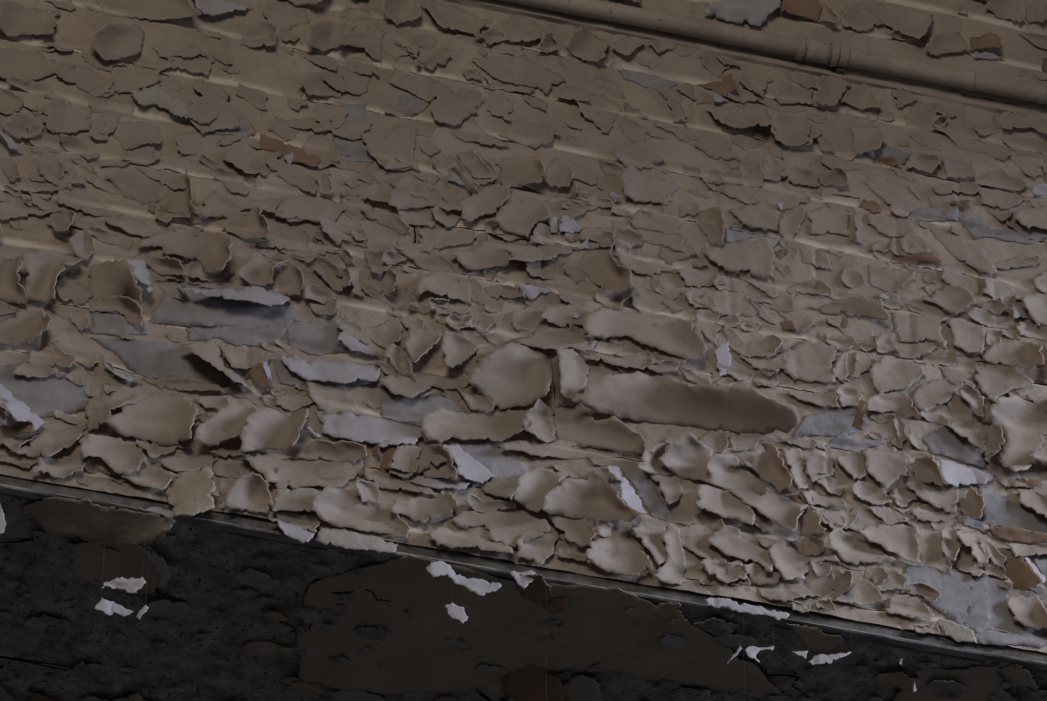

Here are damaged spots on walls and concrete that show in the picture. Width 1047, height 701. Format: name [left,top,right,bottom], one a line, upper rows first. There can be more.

peeling [83,0,202,20]
peeling [240,0,323,55]
peeling [382,0,566,94]
peeling [818,0,1007,60]
peeling [985,0,1047,80]
crack [949,90,1020,106]
crack [910,171,1025,196]
peeling [706,478,1047,649]
peeling [144,599,190,629]
peeling [231,554,828,701]
peeling [788,624,845,655]
peeling [855,658,1047,701]